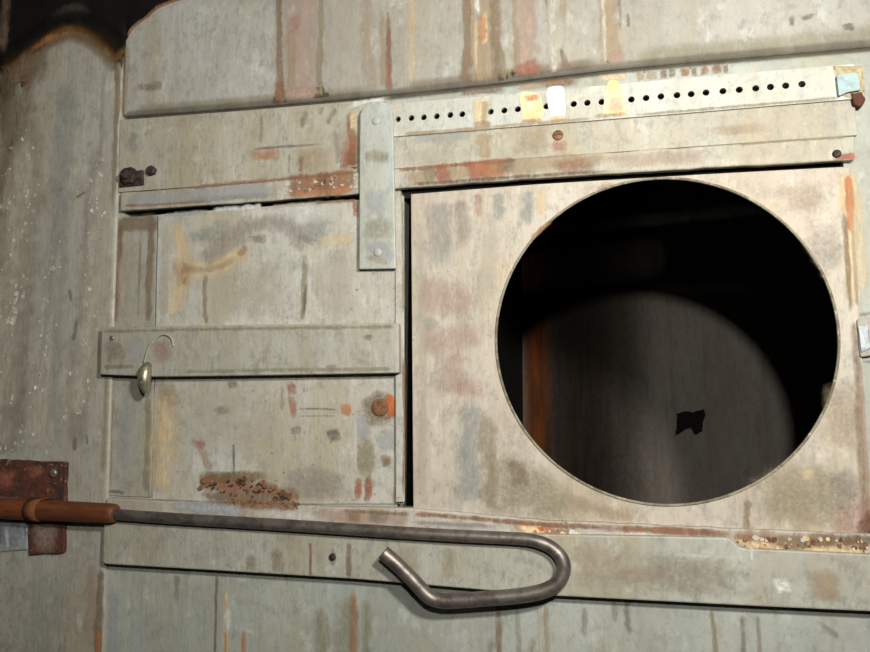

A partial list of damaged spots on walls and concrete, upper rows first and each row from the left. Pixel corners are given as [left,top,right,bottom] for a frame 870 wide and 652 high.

corrosion [276,0,323,101]
corrosion [382,21,392,88]
corrosion [193,98,383,188]
corrosion [839,174,858,305]
corrosion [342,364,405,498]
corrosion [417,513,596,529]
corrosion [623,526,724,536]